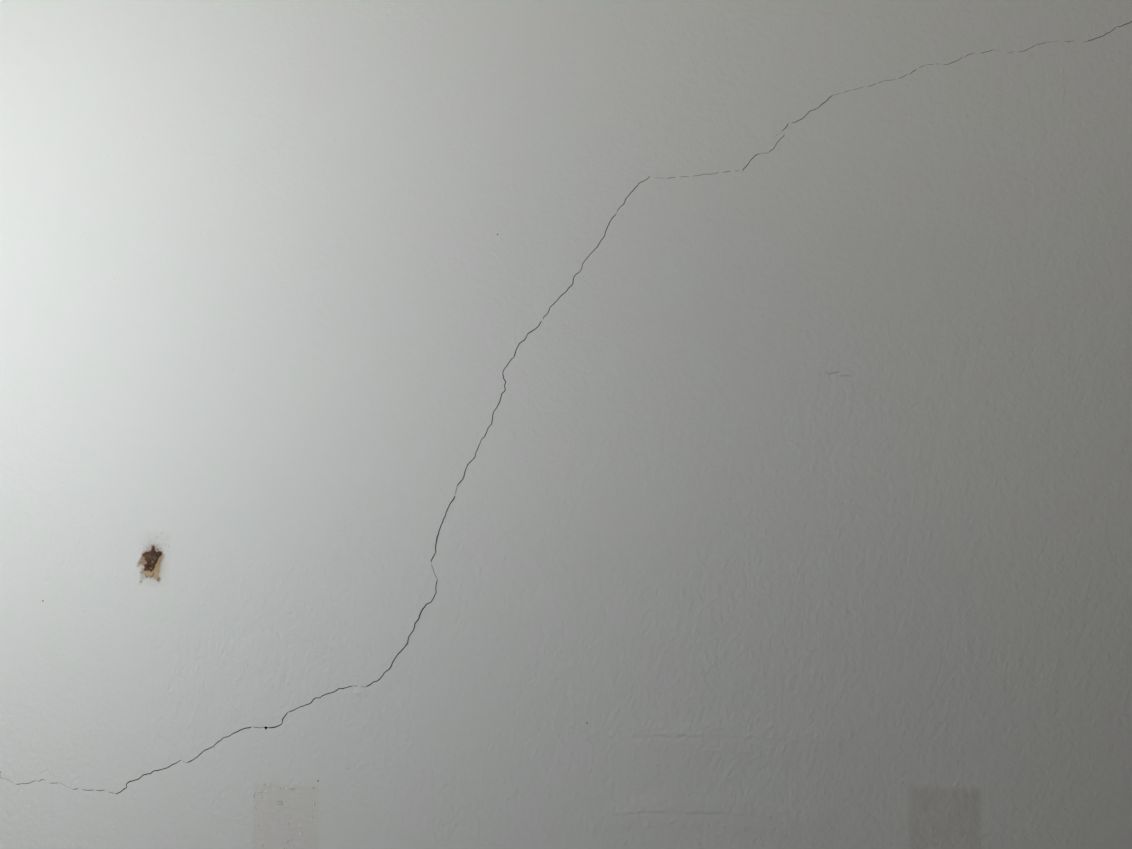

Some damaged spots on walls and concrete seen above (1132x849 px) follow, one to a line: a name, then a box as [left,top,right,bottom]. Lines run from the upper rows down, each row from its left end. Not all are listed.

crack [64,43,1043,794]